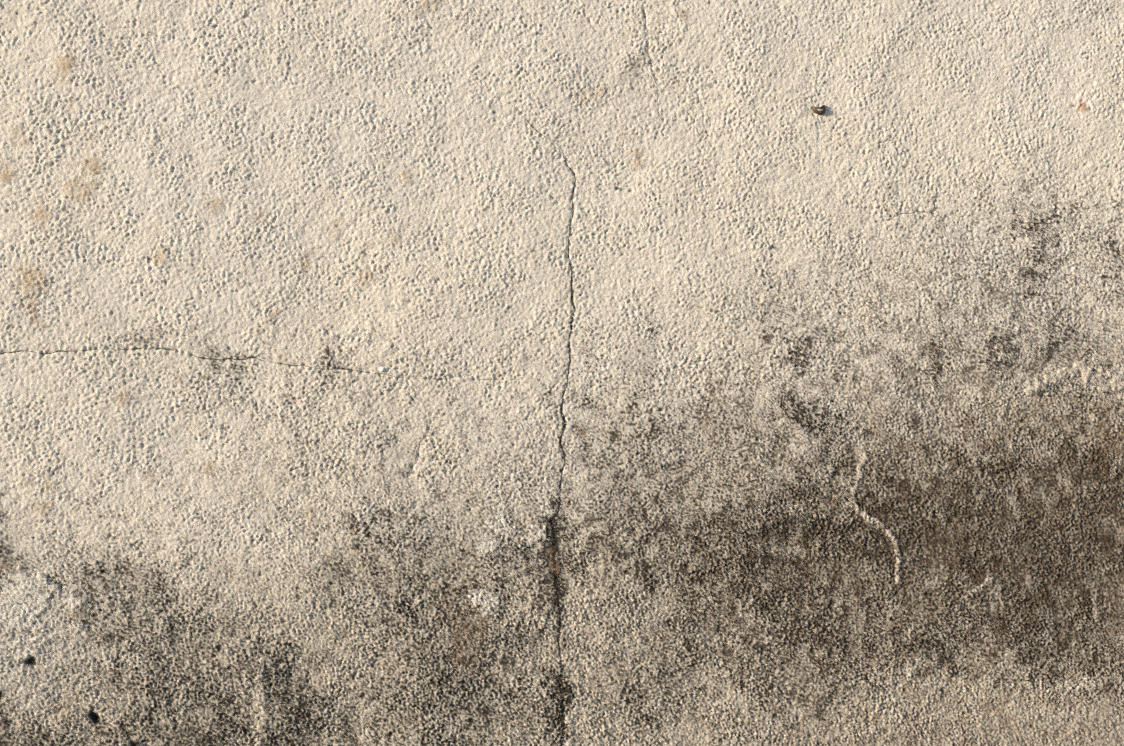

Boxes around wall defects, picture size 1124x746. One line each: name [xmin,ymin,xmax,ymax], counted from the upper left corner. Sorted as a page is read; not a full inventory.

damp [1010,209,1073,297]
crack [0,348,394,377]
damp [784,328,825,375]
damp [920,327,951,387]
damp [972,331,1021,378]
damp [1038,314,1106,366]
crack [507,110,575,746]
damp [0,382,1124,746]